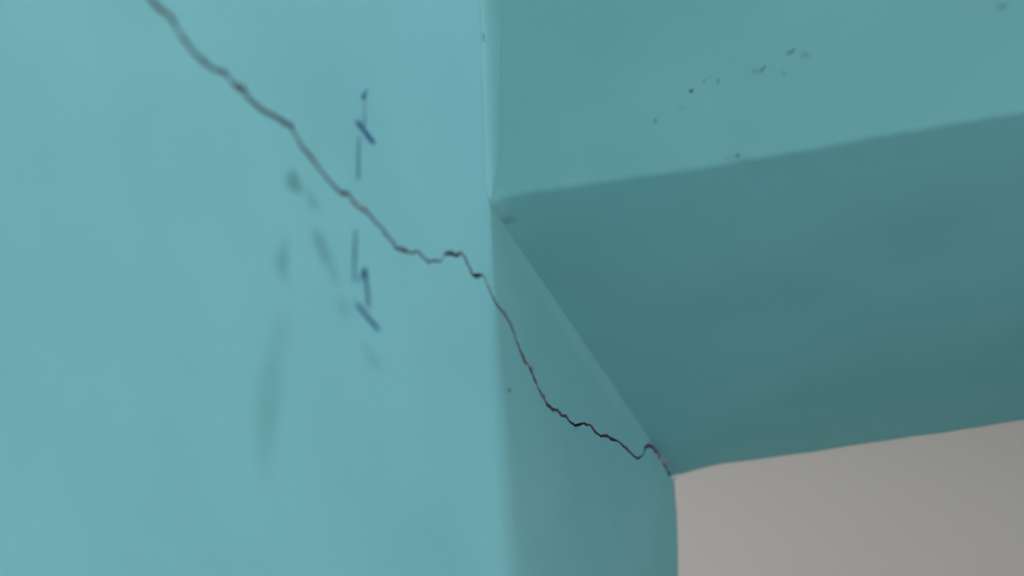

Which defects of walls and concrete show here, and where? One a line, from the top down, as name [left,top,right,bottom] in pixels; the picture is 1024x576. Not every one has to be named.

crack [149,0,671,476]